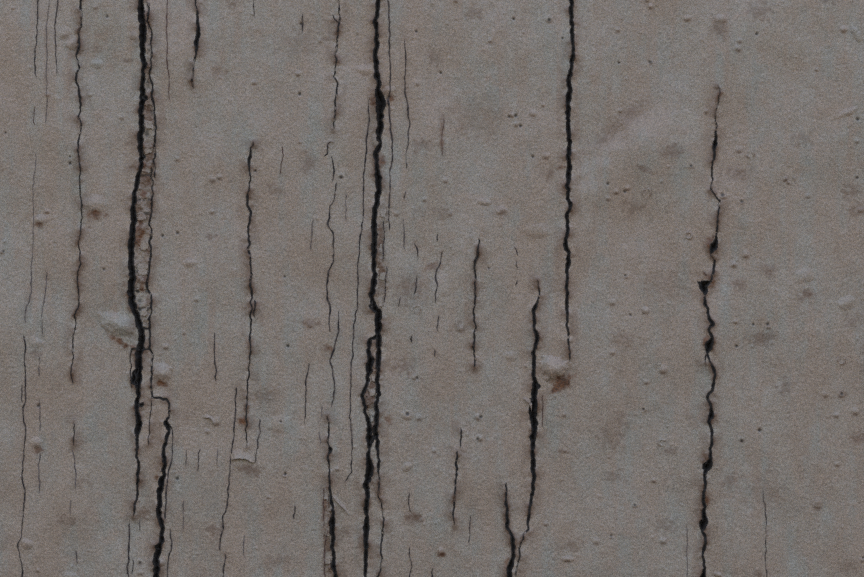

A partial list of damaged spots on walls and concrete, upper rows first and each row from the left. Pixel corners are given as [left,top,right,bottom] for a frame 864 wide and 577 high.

crack [126,0,261,577]
crack [304,0,443,577]
crack [504,246,543,577]
crack [563,0,575,362]
crack [686,86,721,577]